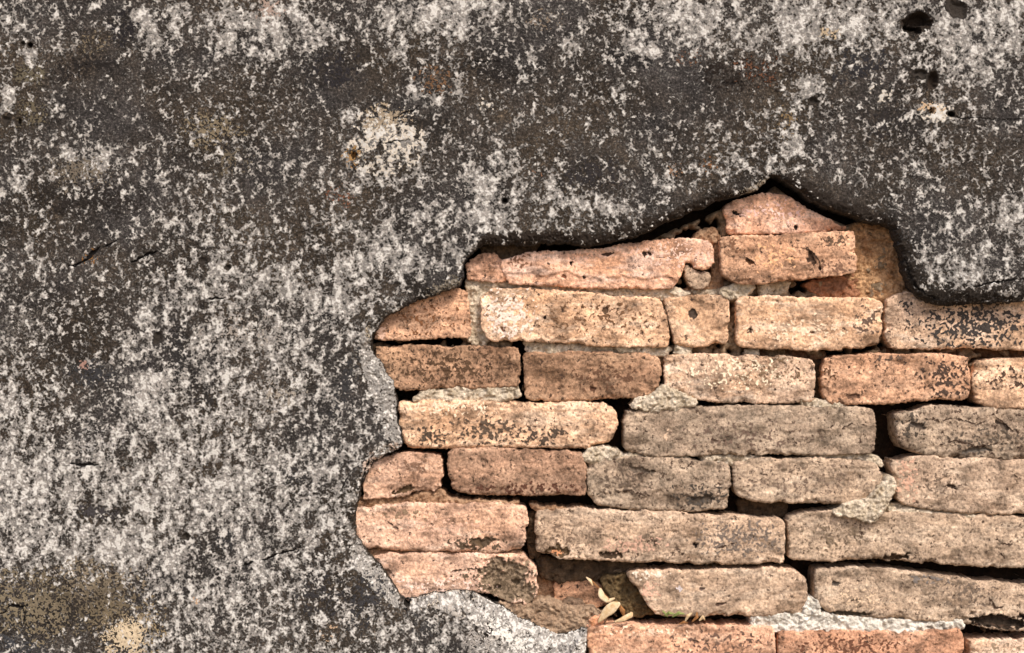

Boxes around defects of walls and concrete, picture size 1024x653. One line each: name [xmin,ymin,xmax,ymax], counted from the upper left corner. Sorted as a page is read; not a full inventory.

spalling [477,177,769,257]
spalling [784,172,1024,306]
crack [68,240,117,267]
crack [131,251,157,263]
spalling [425,274,462,297]
spalling [360,327,401,478]
peeling [962,447,990,455]
peeling [392,484,415,495]
peeling [599,550,623,559]
peeling [883,552,910,561]
peeling [349,537,586,653]
peeling [969,613,1024,630]